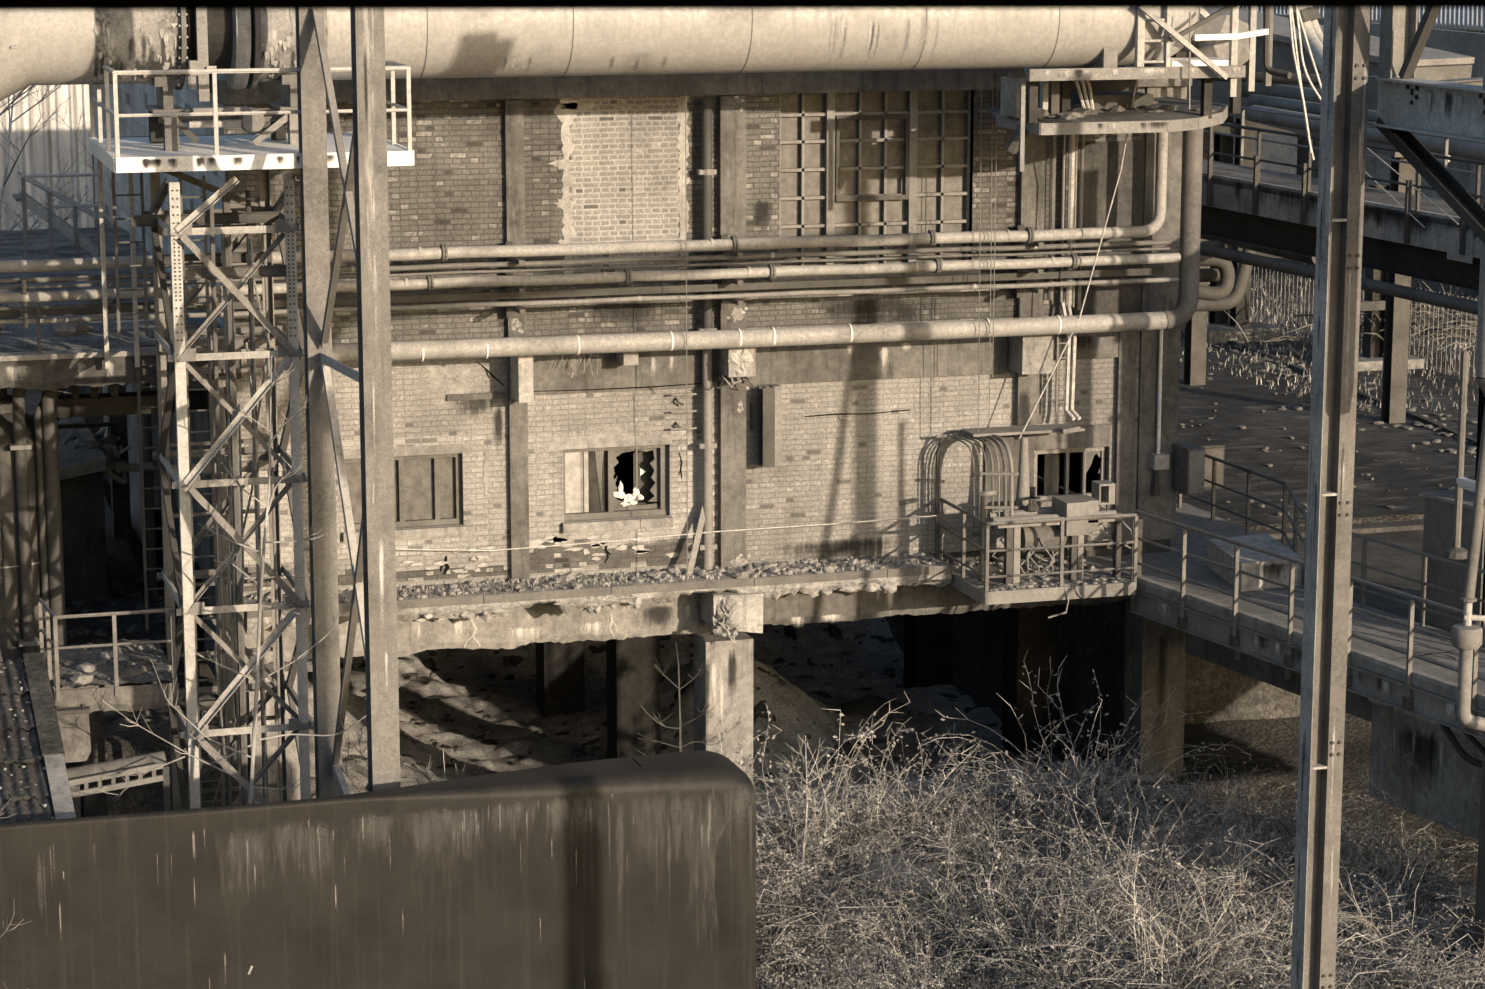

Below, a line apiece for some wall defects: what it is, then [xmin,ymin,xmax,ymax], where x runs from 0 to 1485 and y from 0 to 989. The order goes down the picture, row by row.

spalling [414,603,513,622]
spalling [553,595,643,614]
spalling [712,599,740,644]
leakage [608,811,623,885]
leakage [691,797,752,894]